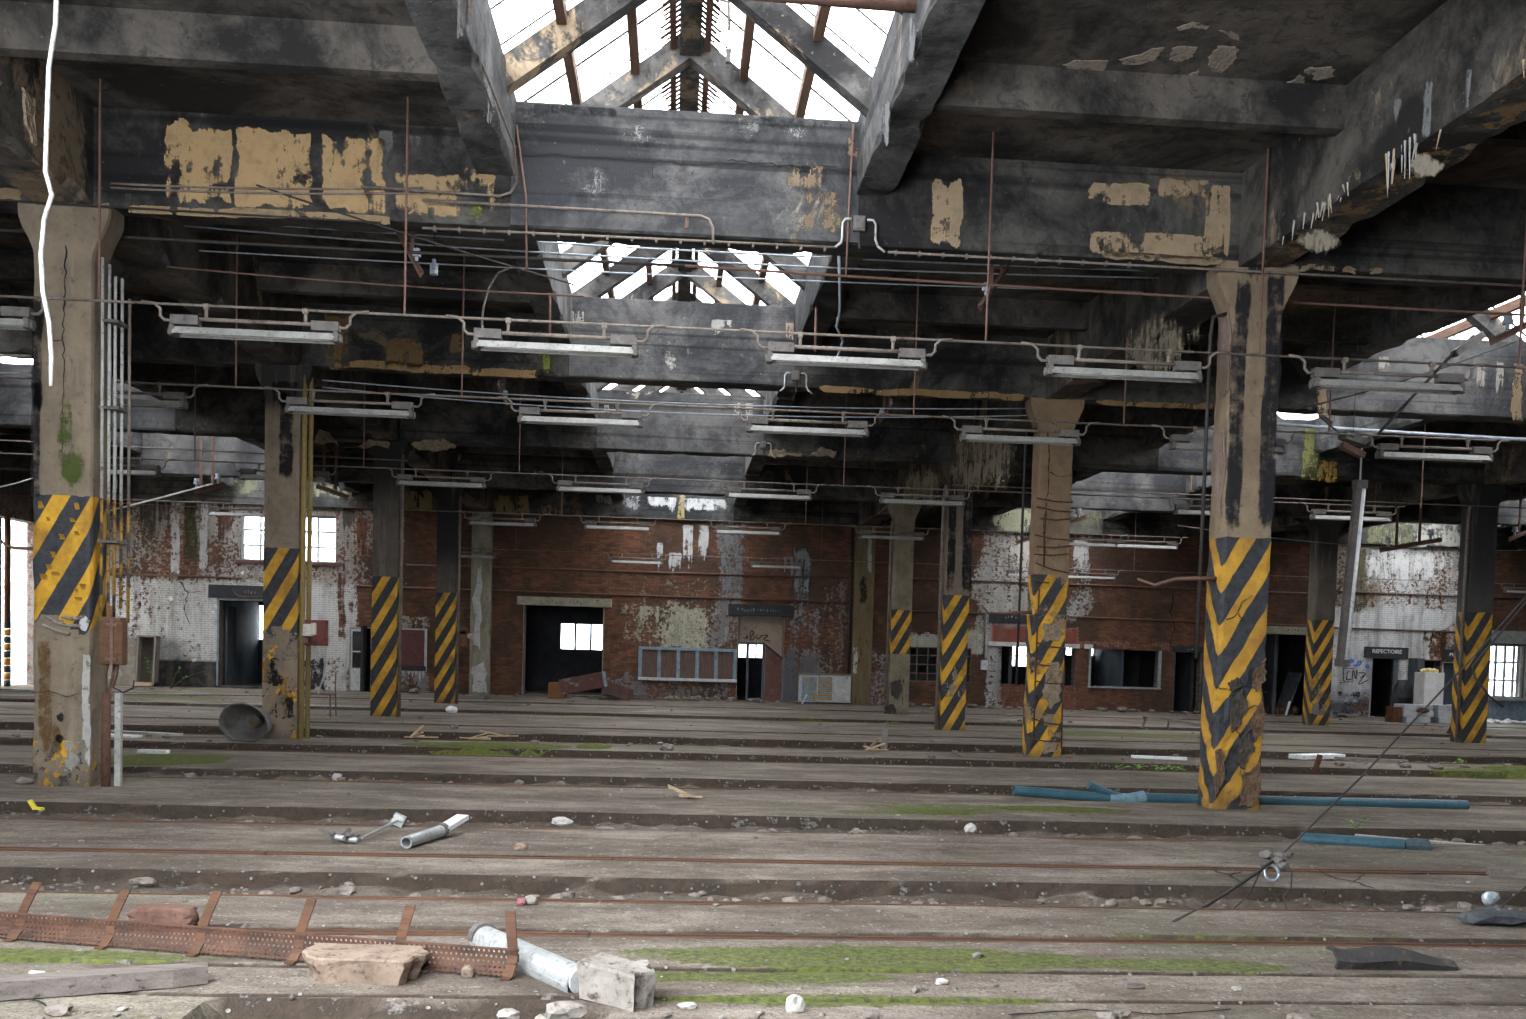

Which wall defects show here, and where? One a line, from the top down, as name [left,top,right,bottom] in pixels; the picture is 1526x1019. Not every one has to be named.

flaking render [1063,22,1240,76]
peeling [128,118,496,225]
peeling [787,163,851,233]
peeling [930,178,963,248]
water stain [1225,267,1284,527]
peeling [117,591,182,637]
spalling [1214,658,1267,808]